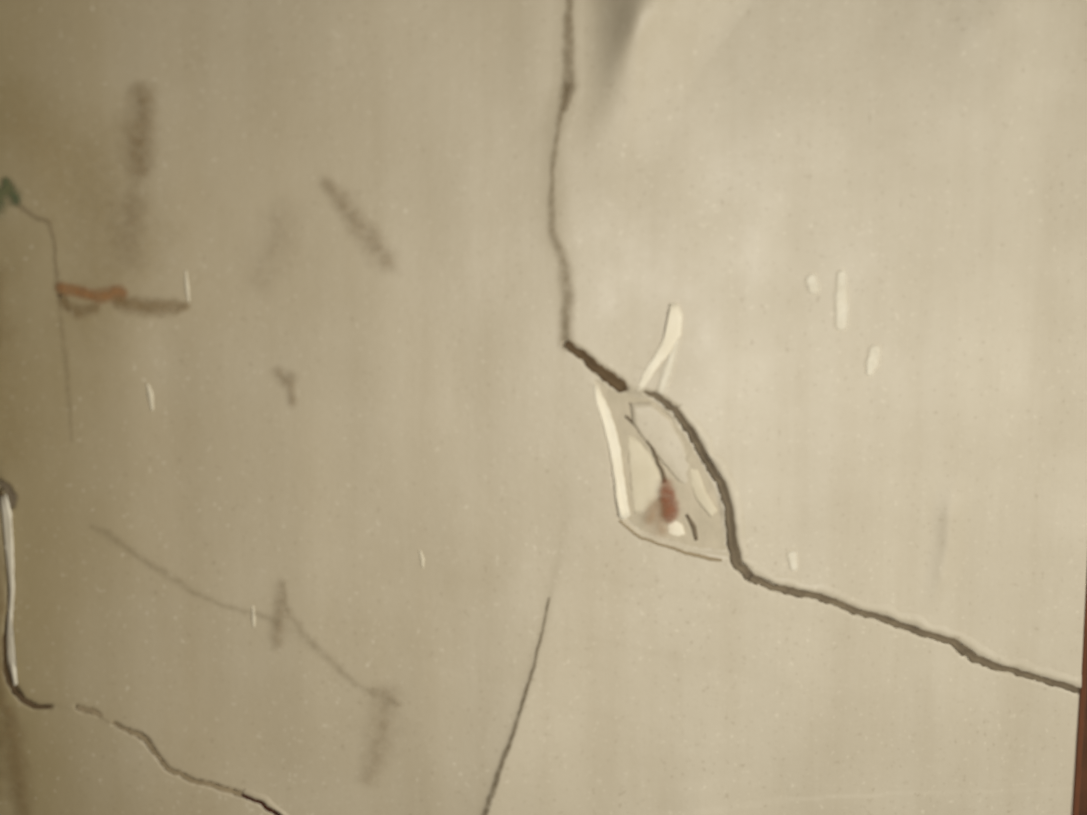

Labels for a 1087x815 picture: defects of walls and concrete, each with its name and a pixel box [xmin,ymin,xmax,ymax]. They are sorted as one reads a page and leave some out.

crack [0,480,289,815]
crack [485,601,549,815]
spalling [593,303,726,562]
crack [564,340,1082,693]